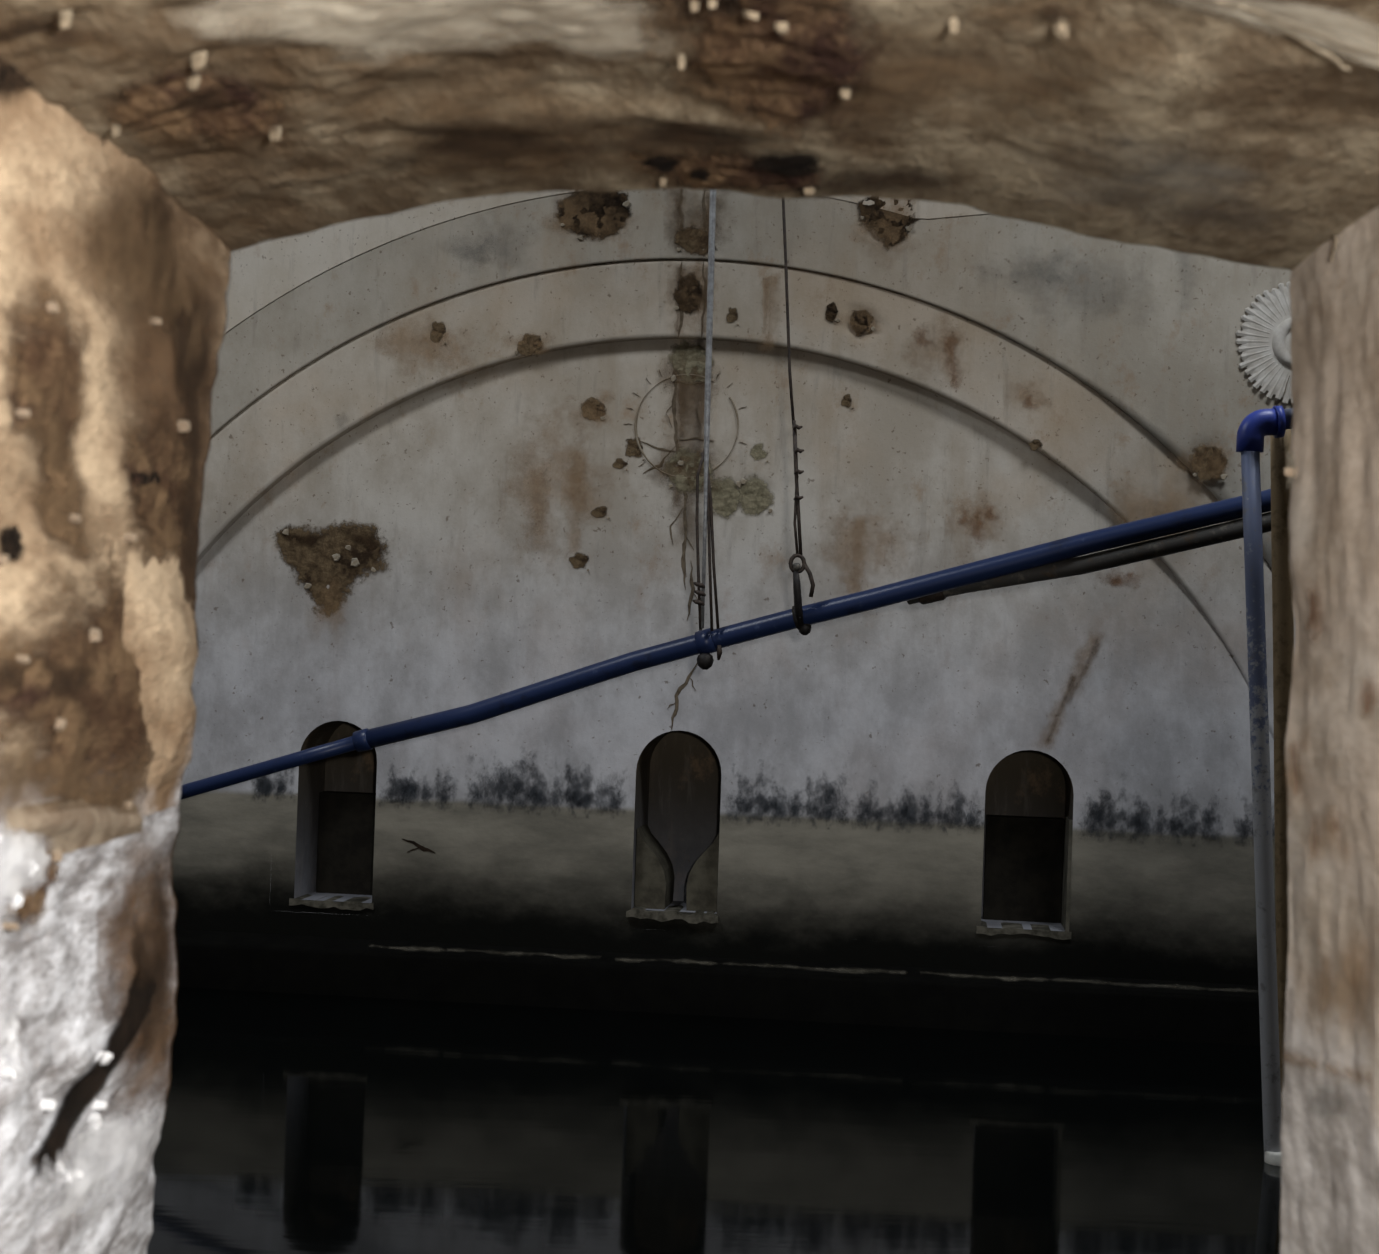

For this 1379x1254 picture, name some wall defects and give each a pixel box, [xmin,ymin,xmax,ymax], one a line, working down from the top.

spalling [556,191,631,241]
spalling [625,150,836,197]
spalling [858,197,914,249]
spalling [673,273,702,314]
damp [102,175,222,650]
spalling [123,414,191,569]
spalling [1189,444,1228,481]
spalling [276,520,388,616]
damp [103,846,177,1096]
crack [32,945,160,1184]